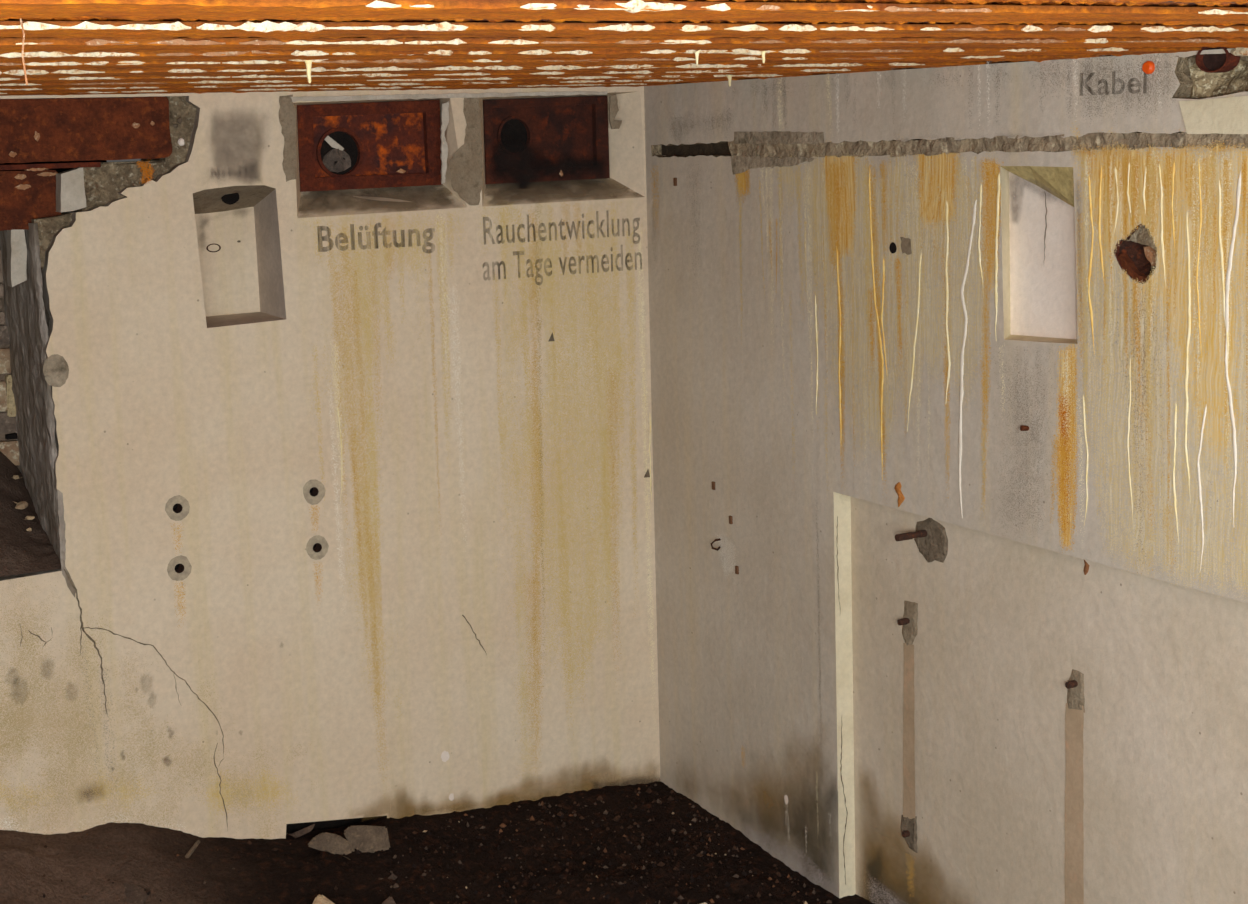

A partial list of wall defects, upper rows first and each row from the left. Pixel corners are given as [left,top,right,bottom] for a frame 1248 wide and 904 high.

spalling [7,96,197,287]
corrosion [734,131,1002,520]
spalling [1118,223,1157,283]
corrosion [1050,121,1248,604]
spalling [1189,60,1248,98]
spalling [57,489,76,597]
water stain [296,198,657,819]
crack [20,569,228,831]
water stain [742,502,839,896]